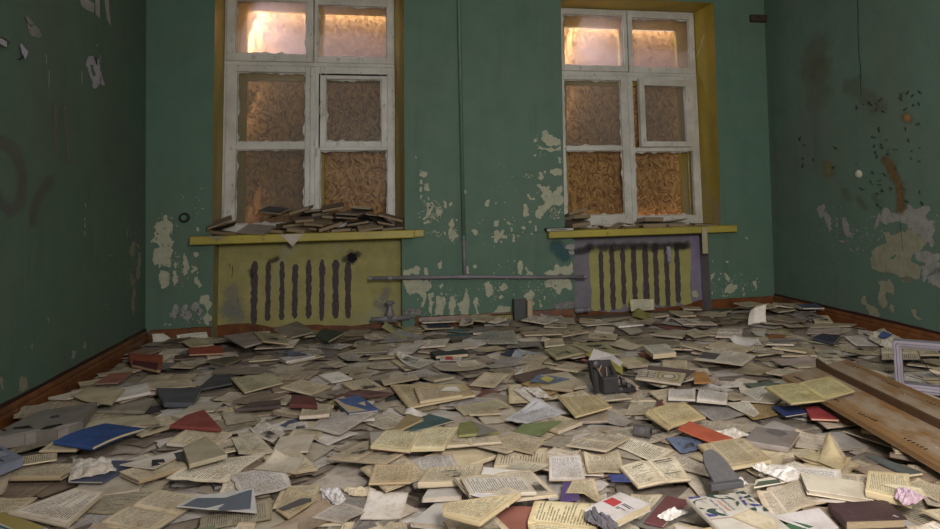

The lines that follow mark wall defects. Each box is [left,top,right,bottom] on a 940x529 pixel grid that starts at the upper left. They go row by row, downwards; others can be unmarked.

peeling [86,56,105,89]
peeling [125,213,212,326]
peeling [418,170,458,244]
peeling [403,244,576,316]
peeling [471,130,564,247]
peeling [800,166,940,317]